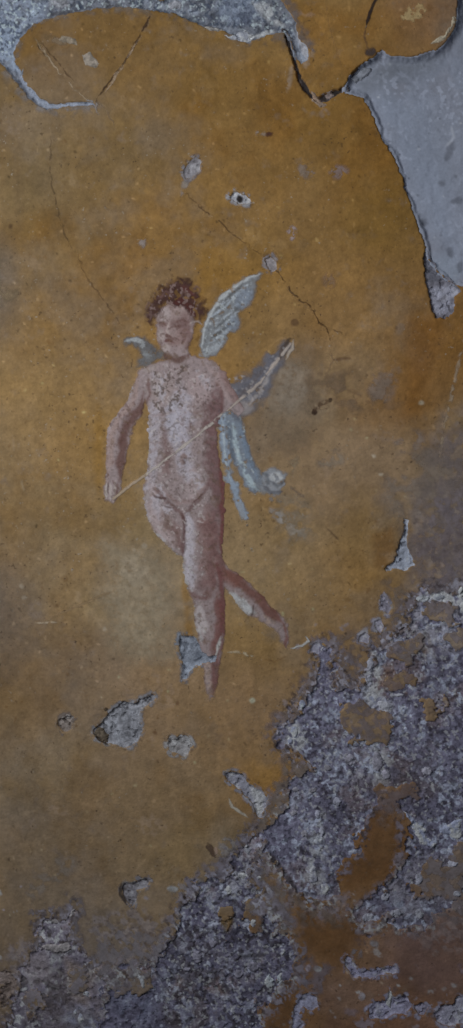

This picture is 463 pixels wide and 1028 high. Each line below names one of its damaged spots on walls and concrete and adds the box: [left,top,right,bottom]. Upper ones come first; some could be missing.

crack [36,17,150,111]
spalling [0,0,314,111]
crack [281,28,349,107]
crack [364,0,377,56]
peeling [342,0,463,319]
spalling [0,519,463,1028]